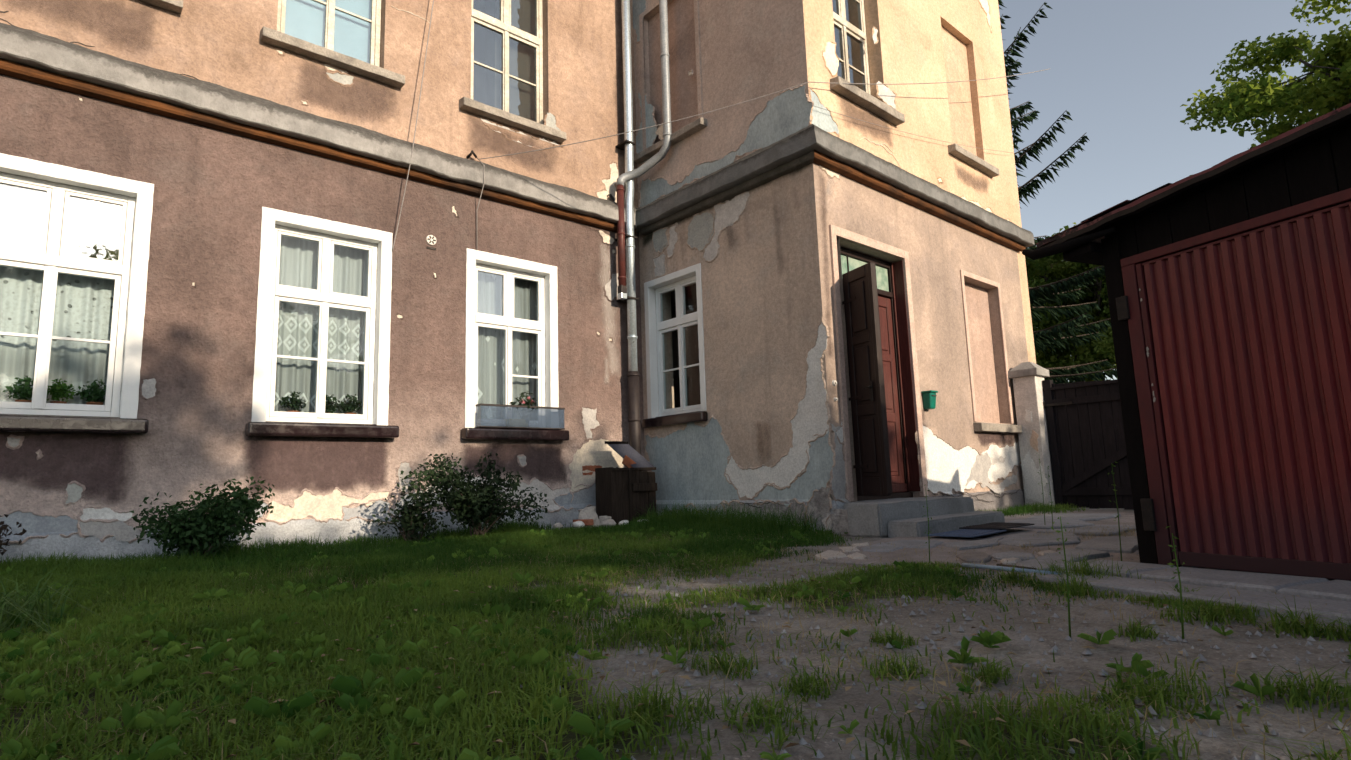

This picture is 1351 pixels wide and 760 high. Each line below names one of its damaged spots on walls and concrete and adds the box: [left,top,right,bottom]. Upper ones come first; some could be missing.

peeling [822,41,839,77]
peeling [749,85,840,138]
peeling [876,81,897,109]
peeling [819,165,840,180]
peeling [652,192,750,278]
water stain [0,432,128,502]
water stain [247,436,387,491]
peeling [248,406,625,525]
peeling [721,317,845,531]
peeling [915,409,1048,503]
peeling [6,481,145,545]